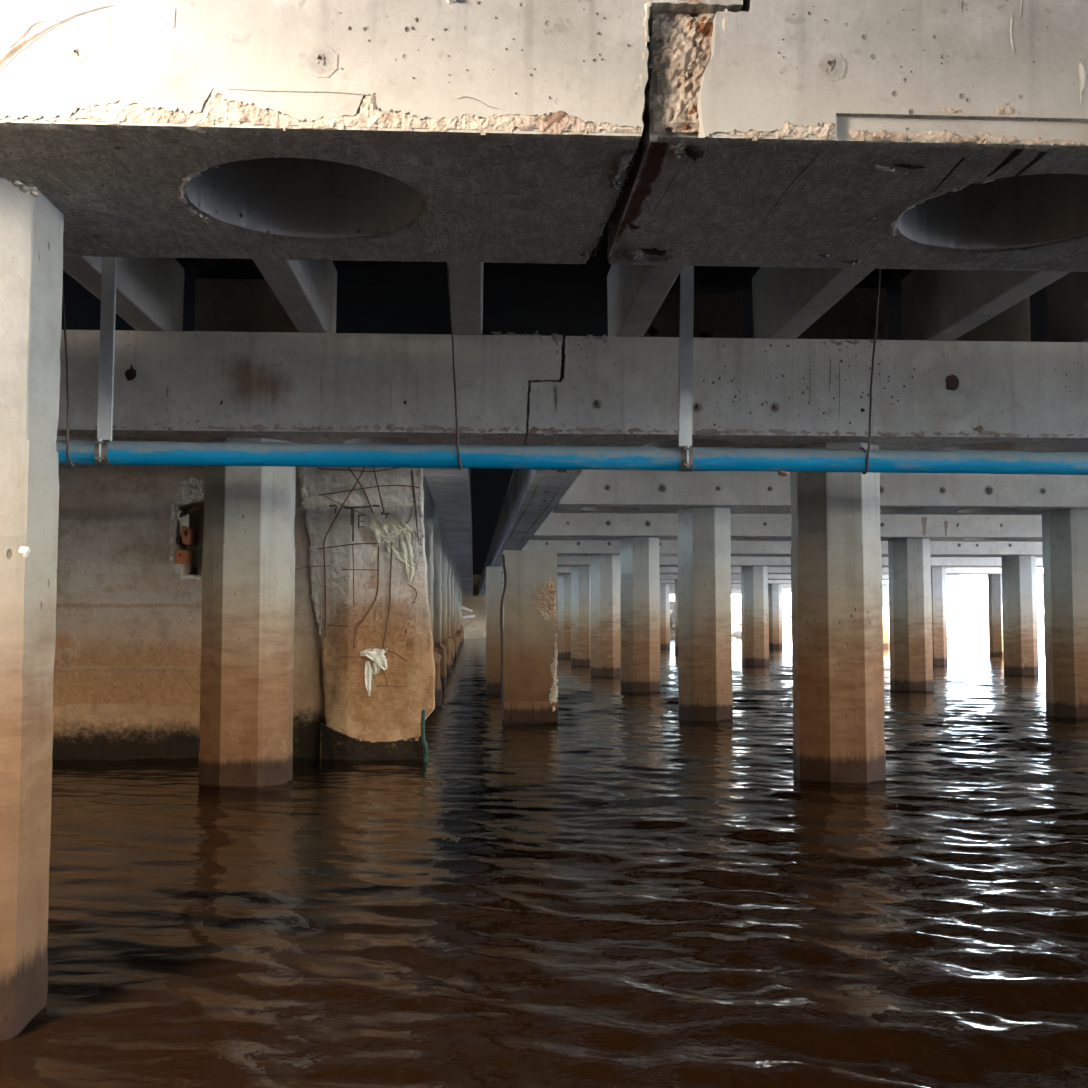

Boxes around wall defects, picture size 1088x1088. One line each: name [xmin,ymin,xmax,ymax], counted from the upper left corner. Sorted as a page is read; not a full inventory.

crack [0,5,113,71]
spalling [0,0,728,163]
rust [608,141,672,258]
spalling [727,121,1088,147]
spalling [169,477,204,581]
spalling [295,467,424,687]
spalling [533,579,558,712]
leakage [0,437,305,1041]